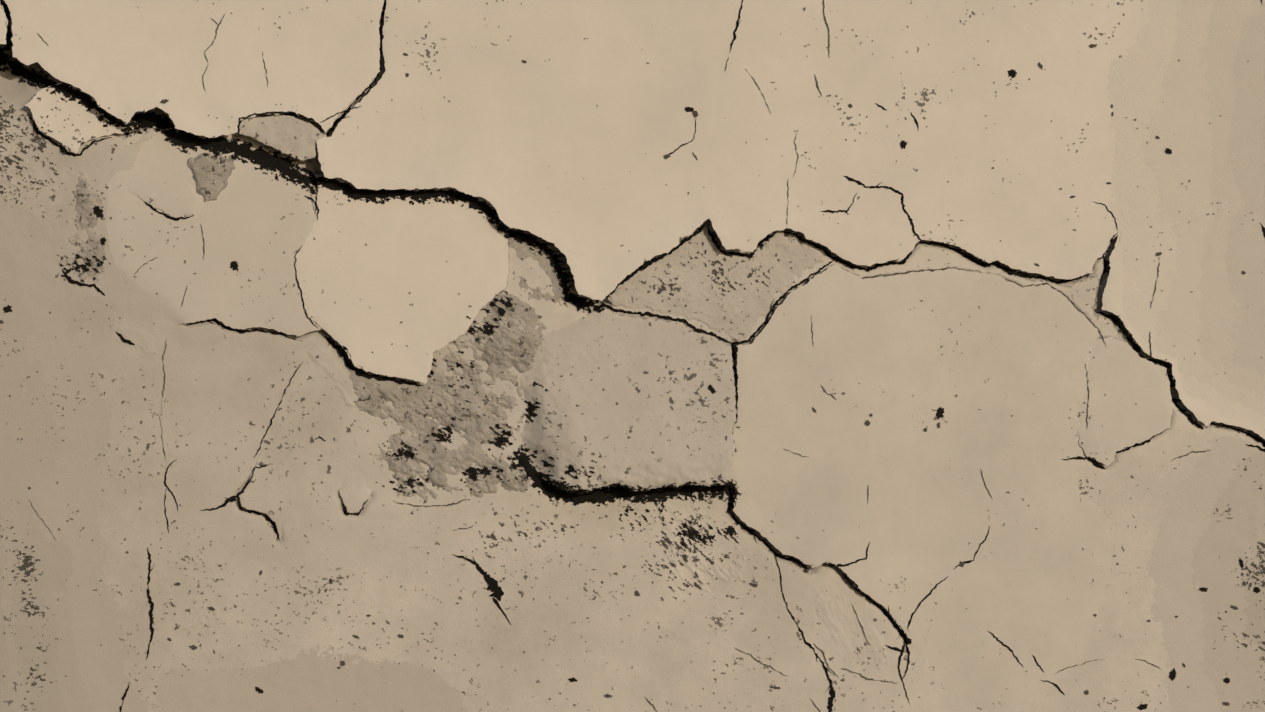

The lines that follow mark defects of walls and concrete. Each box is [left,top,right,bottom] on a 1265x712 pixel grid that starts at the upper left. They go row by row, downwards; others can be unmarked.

peeling [106,131,569,504]
peeling [0,0,1265,439]
crack [116,246,424,712]
peeling [229,440,321,539]
peeling [339,471,373,513]
crack [342,498,474,531]
spalling [649,491,770,630]
crack [519,451,990,712]
peeling [732,264,1173,705]
crack [988,631,1104,695]